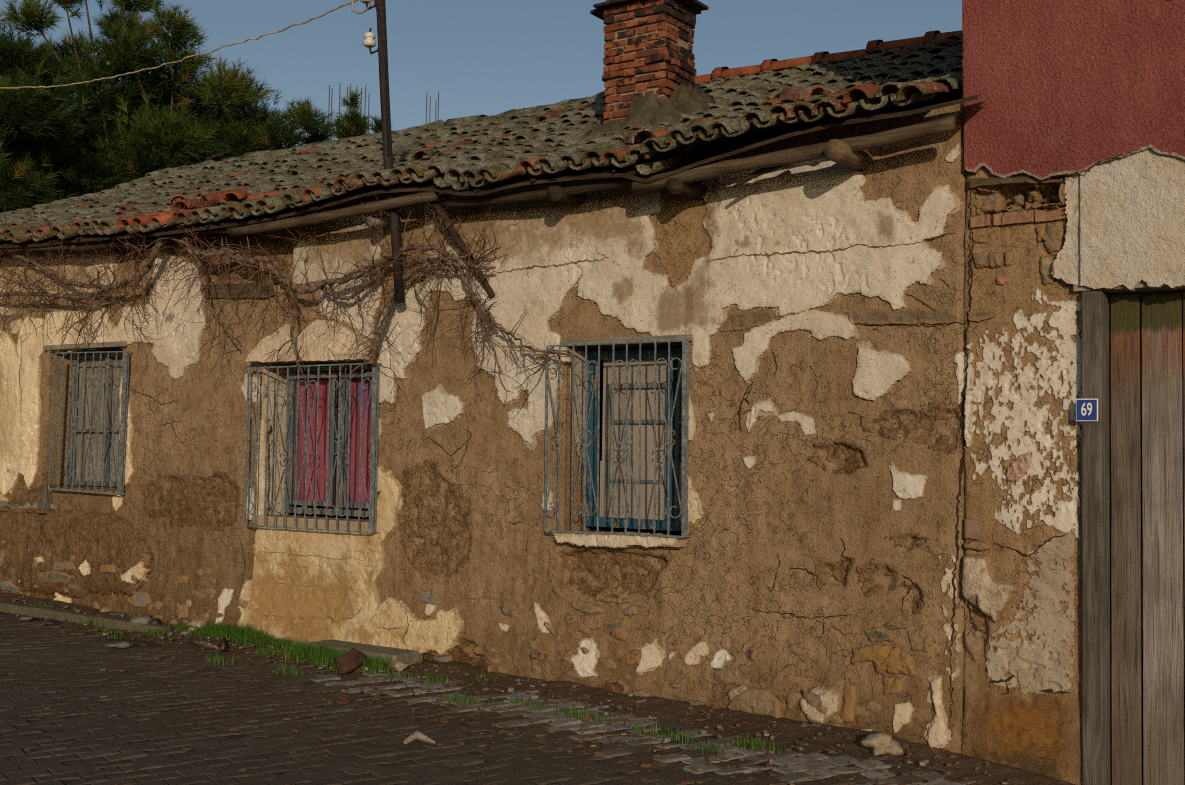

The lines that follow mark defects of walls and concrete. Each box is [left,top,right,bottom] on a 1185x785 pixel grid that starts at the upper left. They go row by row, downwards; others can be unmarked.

flaking render [0,157,1082,748]
crack [711,182,1015,738]
crack [993,535,1066,557]
crack [1039,688,1071,759]